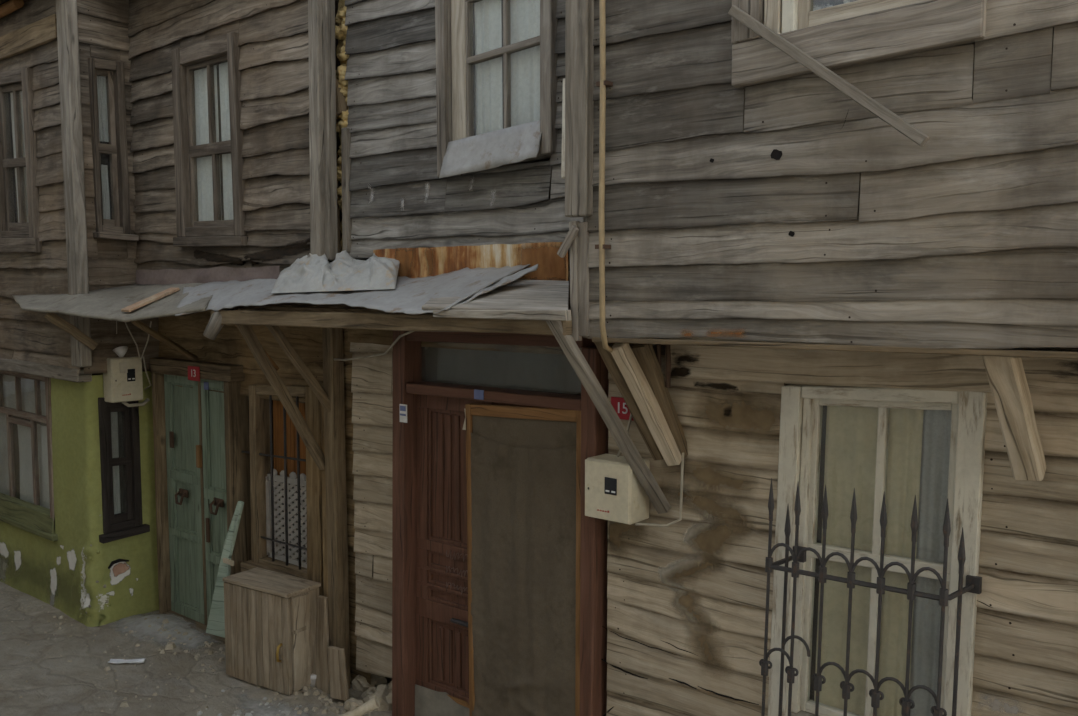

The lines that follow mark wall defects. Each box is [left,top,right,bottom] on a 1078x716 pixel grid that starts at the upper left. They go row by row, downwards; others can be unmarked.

corrosion [395,248,434,278]
corrosion [520,244,567,281]
peeling [0,542,21,579]
flaking render [50,544,138,614]